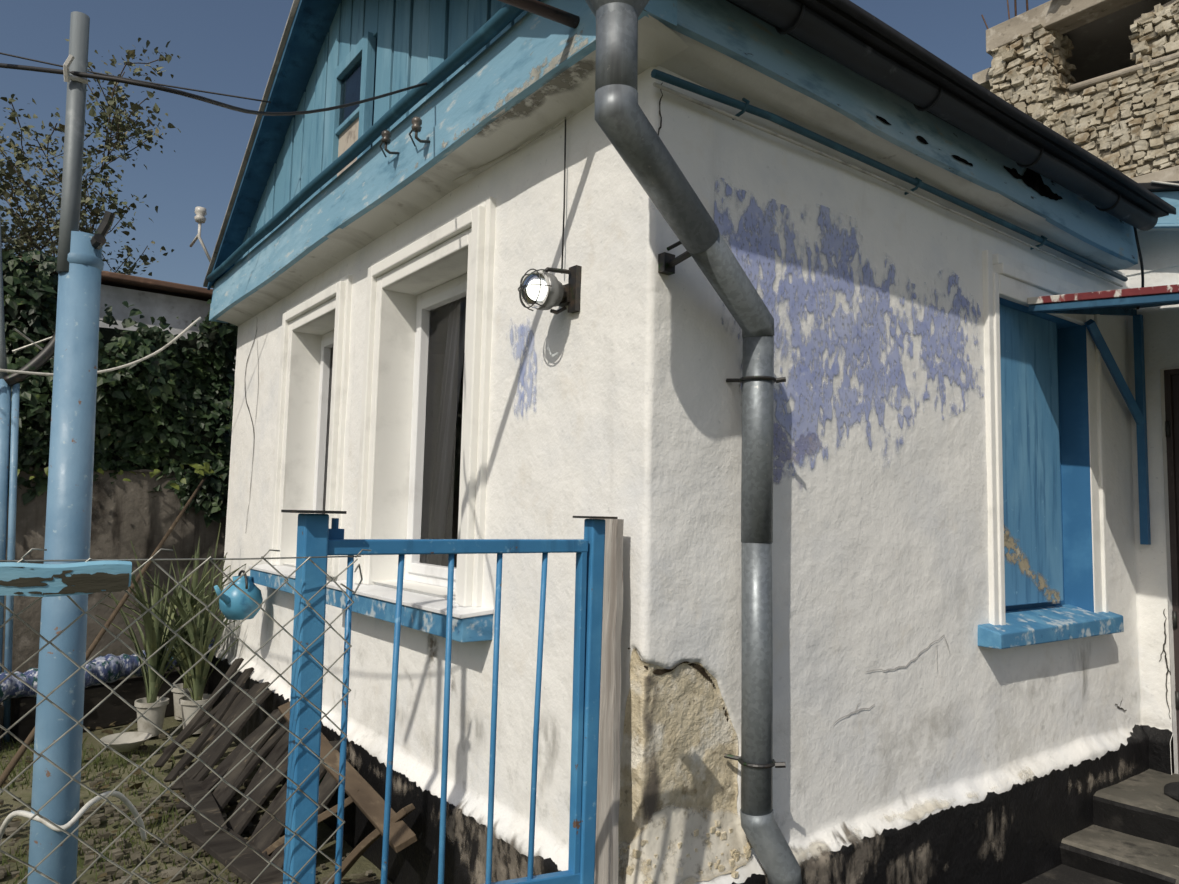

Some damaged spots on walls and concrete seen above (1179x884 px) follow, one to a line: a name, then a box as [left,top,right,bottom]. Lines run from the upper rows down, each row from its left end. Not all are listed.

peeling [510,325,537,416]
peeling [714,178,984,483]
crack [866,635,950,672]
crack [1159,609,1171,719]
crack [832,700,875,726]
spalling [618,648,768,884]
peeling [794,823,883,884]